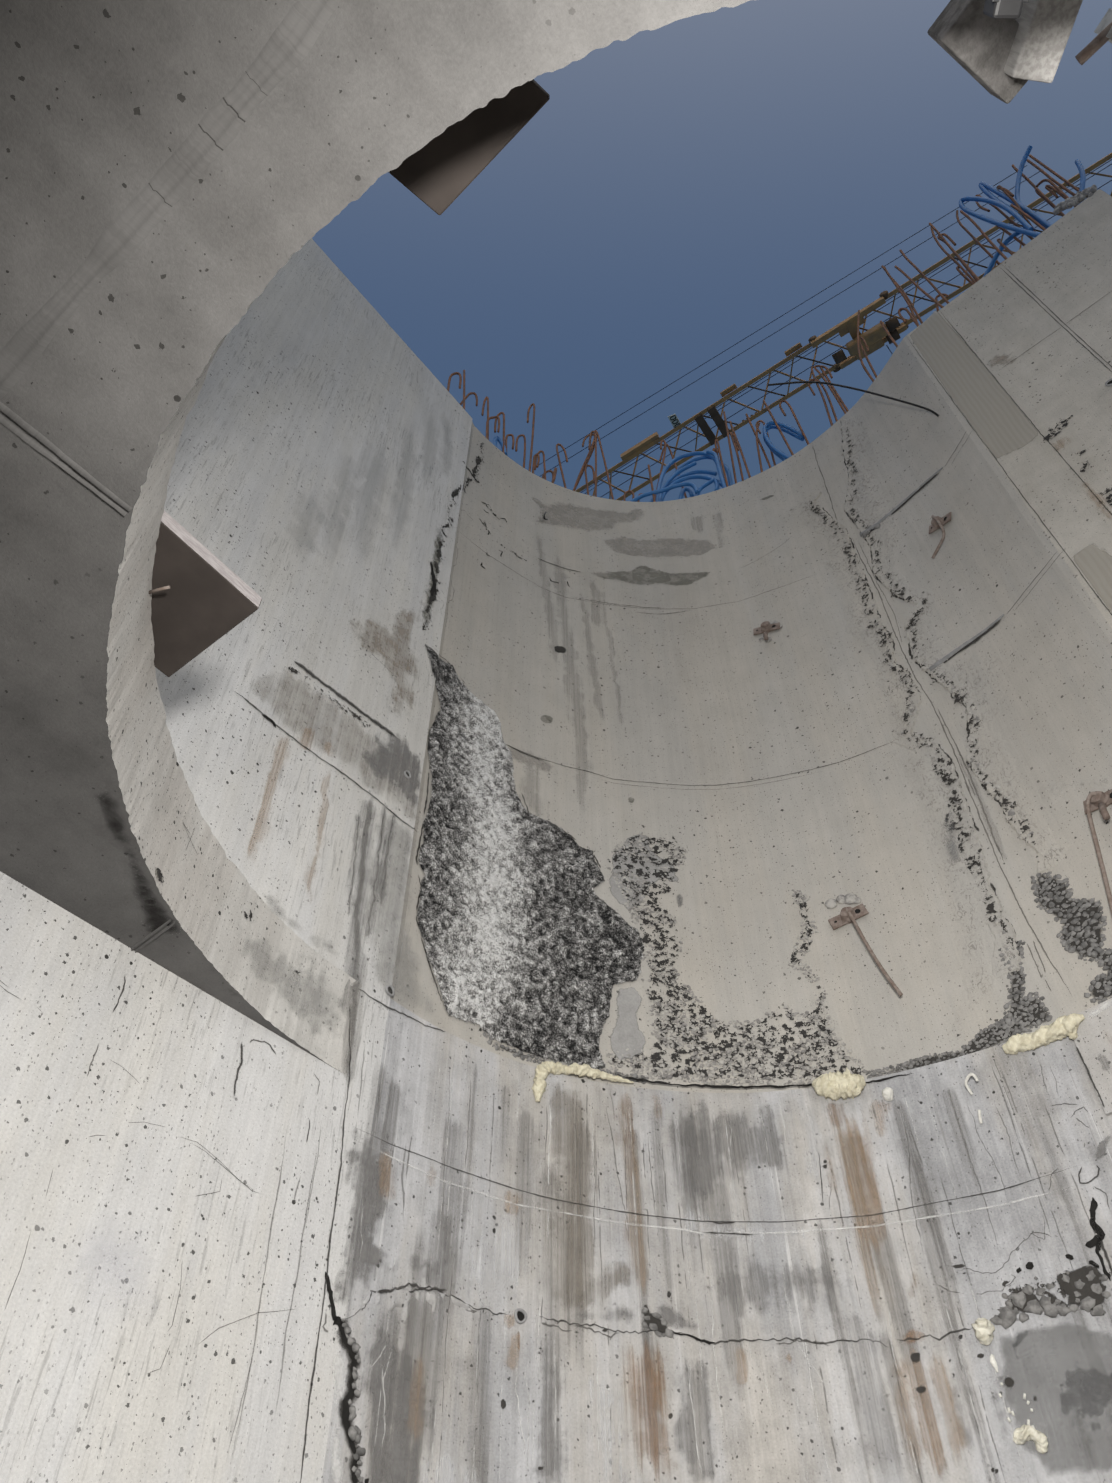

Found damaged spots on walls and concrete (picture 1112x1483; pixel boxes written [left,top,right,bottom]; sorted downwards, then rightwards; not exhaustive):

spalling [808,365,1036,943]
spalling [416,644,644,1069]
water stain [339,1150,396,1299]
water stain [548,1093,593,1307]
water stain [679,1111,784,1195]
crack [941,1169,1057,1294]
spalling [990,1254,1112,1329]
crack [1085,1197,1112,1281]
water stain [370,1324,436,1483]
crack [323,1272,970,1483]
water stain [662,1305,721,1475]
spalling [892,1353,926,1393]